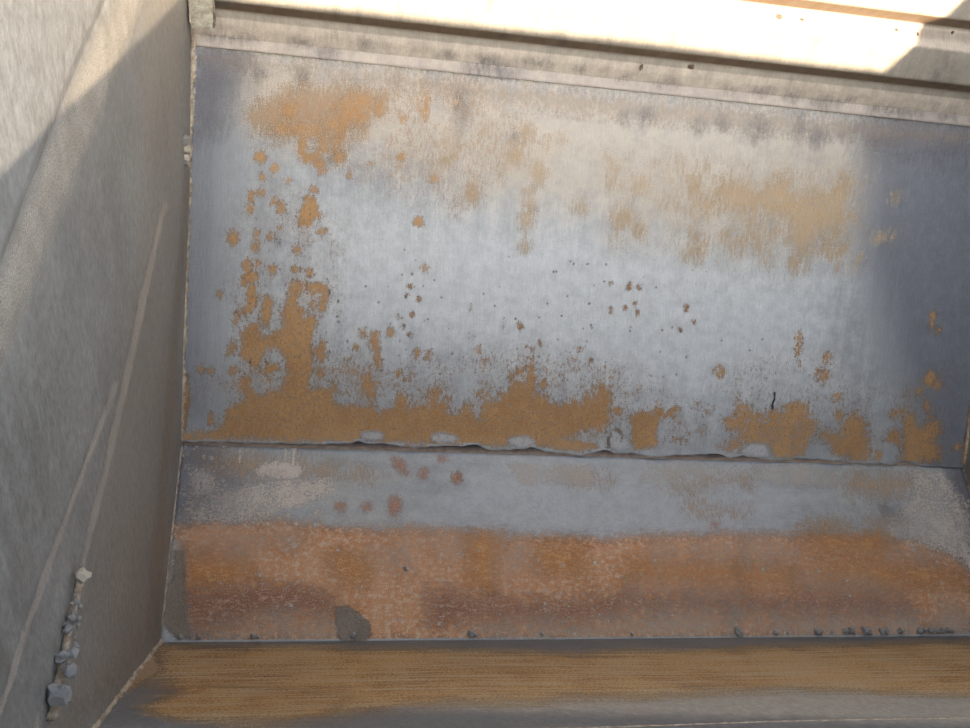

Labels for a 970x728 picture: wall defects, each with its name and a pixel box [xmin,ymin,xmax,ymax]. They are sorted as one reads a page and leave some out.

corrosion [182,77,715,454]
corrosion [604,154,865,276]
peeling [361,431,383,441]
peeling [430,432,458,444]
peeling [508,436,535,447]
peeling [606,427,631,451]
corrosion [713,329,970,465]
corrosion [141,496,970,728]